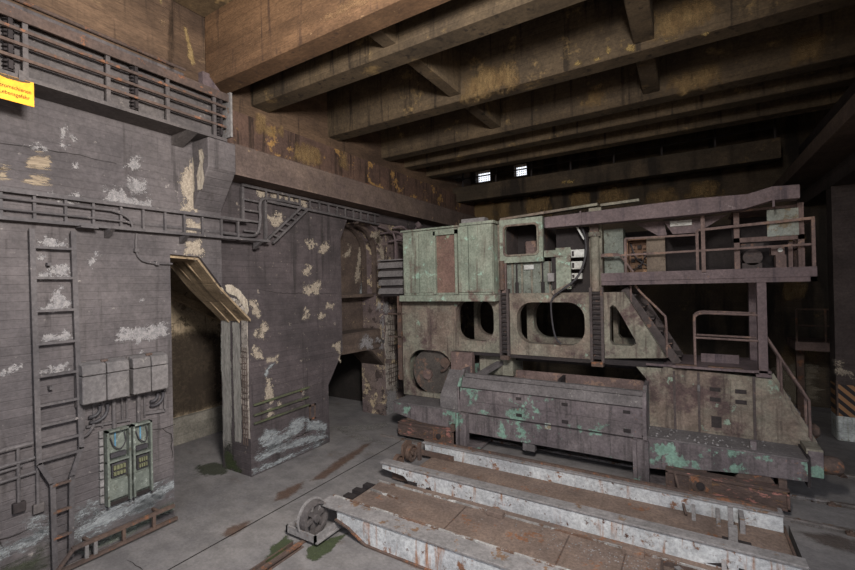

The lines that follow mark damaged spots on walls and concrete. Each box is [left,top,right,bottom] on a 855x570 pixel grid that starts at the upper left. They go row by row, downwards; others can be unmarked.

peeling [103,174,152,210]
peeling [179,149,205,261]
peeling [115,321,170,354]
peeling [221,285,281,452]
efflorescence [252,417,328,474]